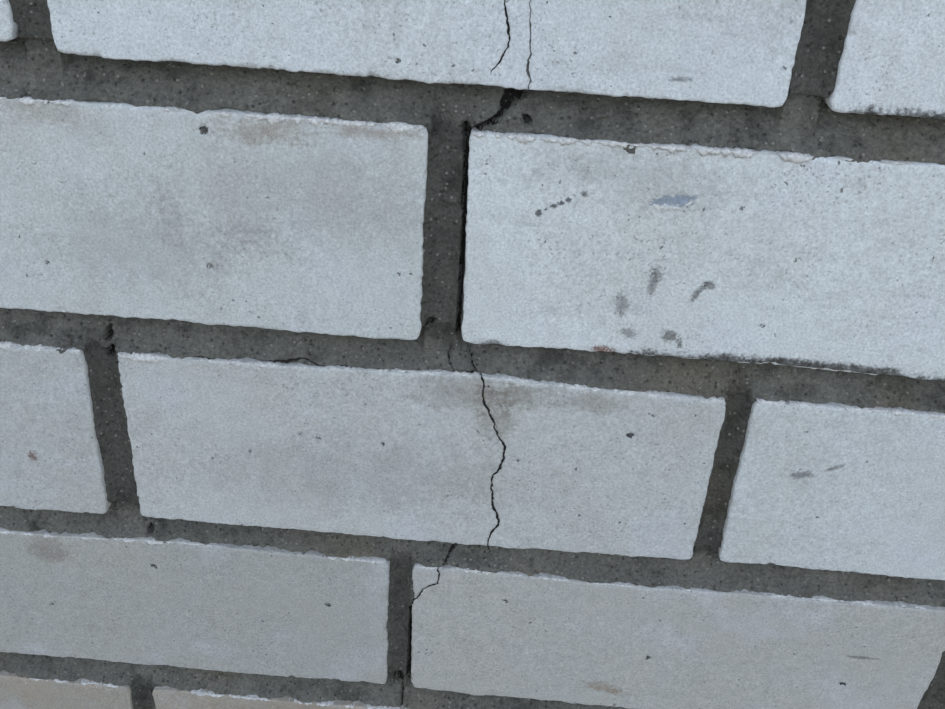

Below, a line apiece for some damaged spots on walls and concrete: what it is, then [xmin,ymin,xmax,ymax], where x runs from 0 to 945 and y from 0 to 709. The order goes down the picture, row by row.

crack [447,0,532,550]
crack [400,543,457,707]